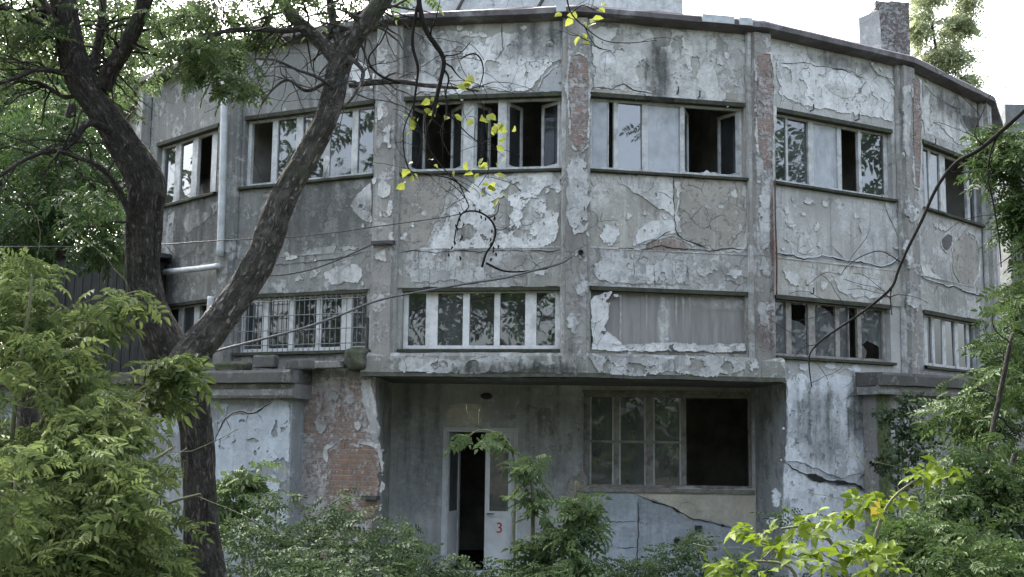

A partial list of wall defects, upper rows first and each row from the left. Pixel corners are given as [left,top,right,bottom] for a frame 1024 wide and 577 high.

peeling [283,238,364,290]
peeling [346,23,981,379]
crack [618,177,746,281]
peeling [215,399,291,528]
spalling [314,378,385,527]
crack [602,492,730,564]
crack [785,461,865,491]